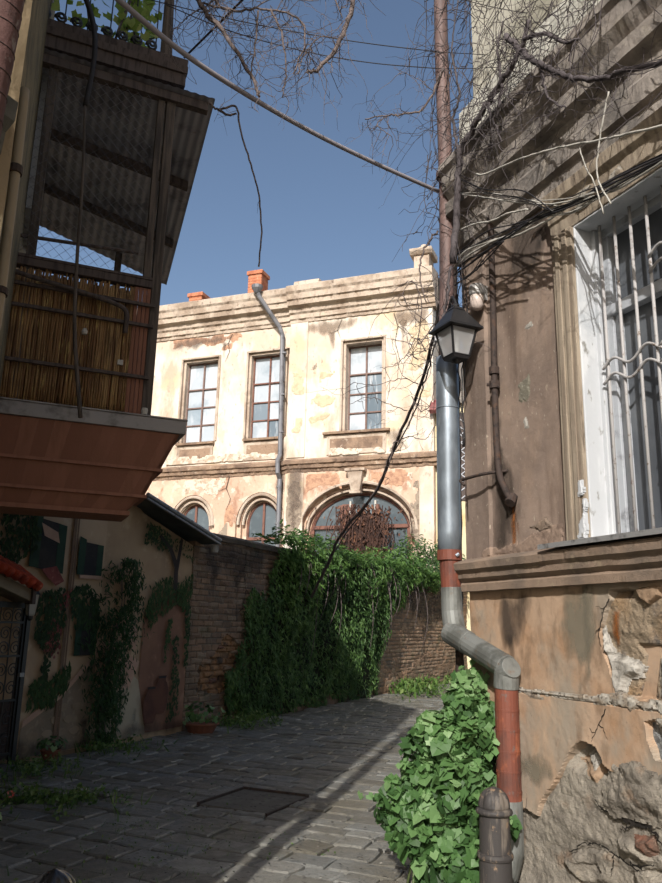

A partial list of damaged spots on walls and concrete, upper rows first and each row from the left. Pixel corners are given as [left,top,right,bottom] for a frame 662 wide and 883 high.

flaking render [173,332,242,351]
flaking render [291,373,336,433]
water stain [502,597,526,644]
water stain [565,591,595,661]
crack [595,599,610,652]
flaking render [518,586,662,760]
flaking render [517,744,662,883]